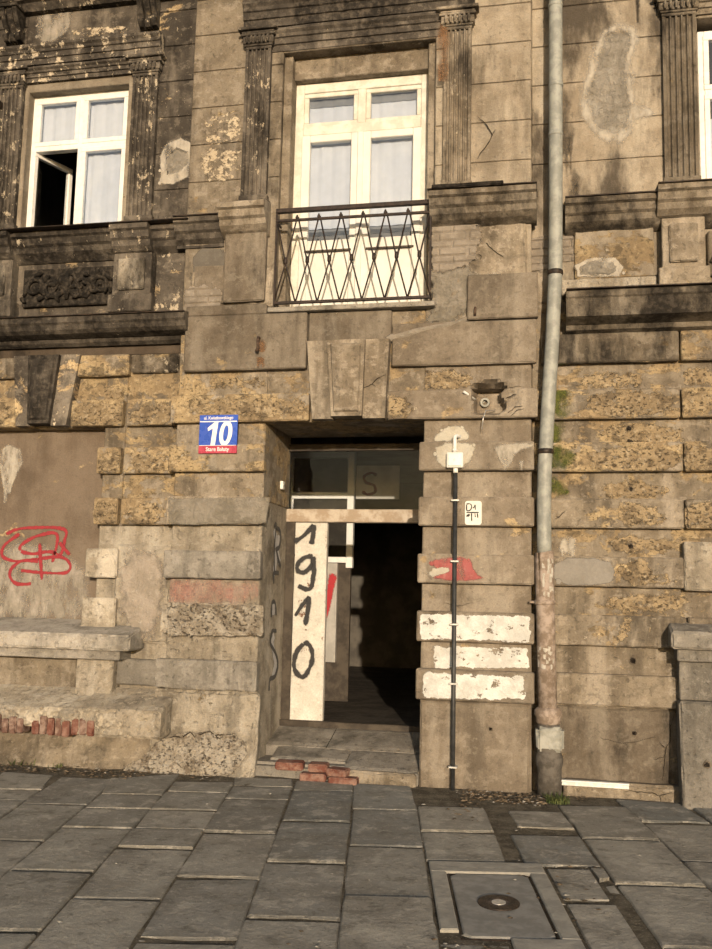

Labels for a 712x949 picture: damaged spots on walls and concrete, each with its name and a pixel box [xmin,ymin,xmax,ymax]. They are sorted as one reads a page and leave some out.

peeling [72,26,126,36]
flaking render [581,26,652,142]
flaking render [158,112,241,185]
water stain [563,95,579,195]
flaking render [425,224,482,323]
flaking render [123,731,247,776]
crack [586,711,676,801]